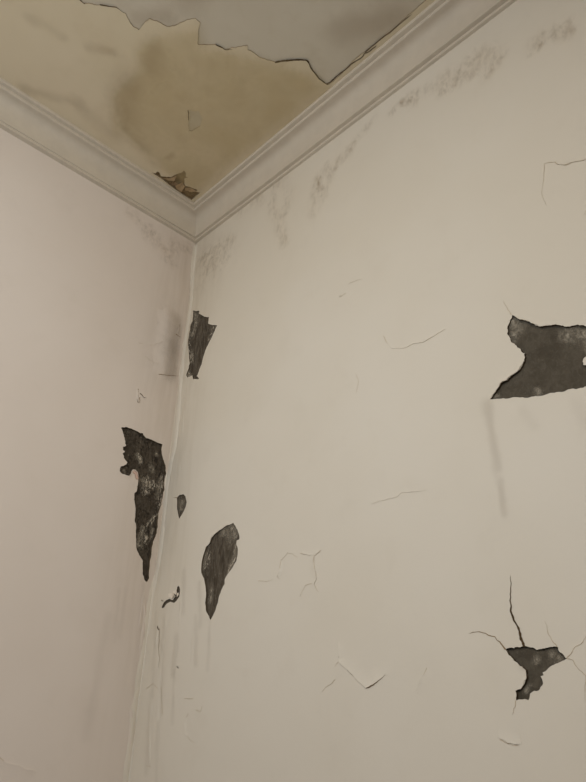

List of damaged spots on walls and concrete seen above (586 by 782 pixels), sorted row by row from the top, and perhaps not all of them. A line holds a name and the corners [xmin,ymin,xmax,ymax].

peeling [80,0,426,85]
peeling [152,171,199,200]
peeling [176,311,218,379]
peeling [484,303,586,399]
peeling [120,427,166,582]
peeling [174,494,187,518]
peeling [201,519,239,620]
peeling [472,576,586,712]